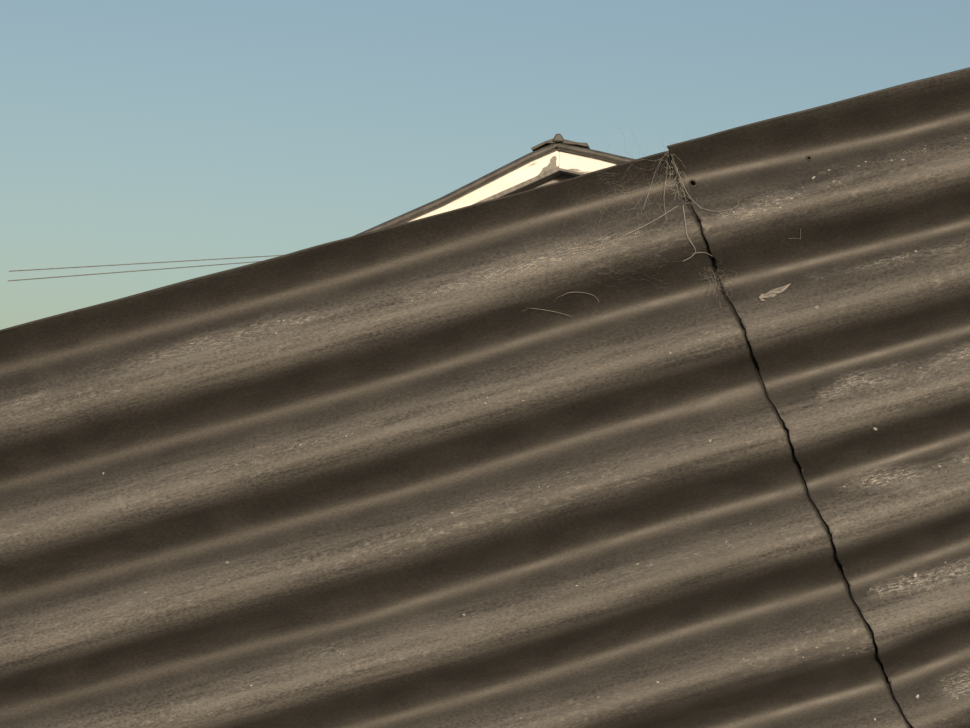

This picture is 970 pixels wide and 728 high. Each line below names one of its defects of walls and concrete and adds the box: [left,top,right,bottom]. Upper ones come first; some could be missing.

peeling [530,154,588,175]